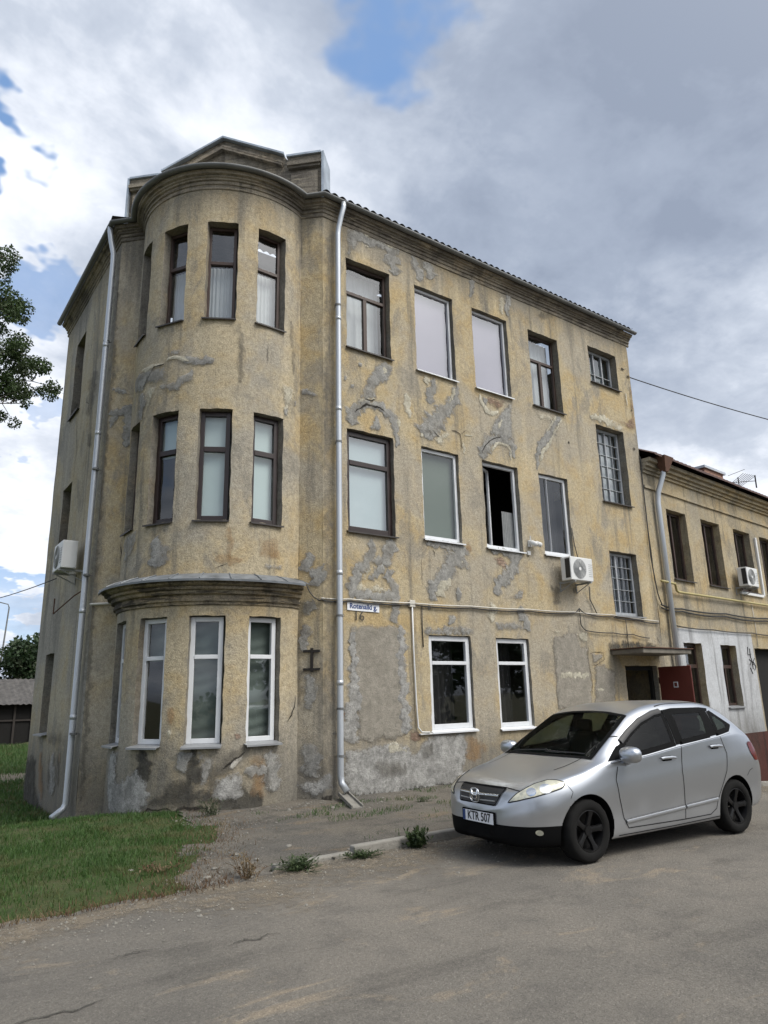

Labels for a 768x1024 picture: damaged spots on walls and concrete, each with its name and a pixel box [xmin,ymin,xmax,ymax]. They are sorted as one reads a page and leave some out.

peeling [388,732,421,753]
spalling [297,743,332,801]